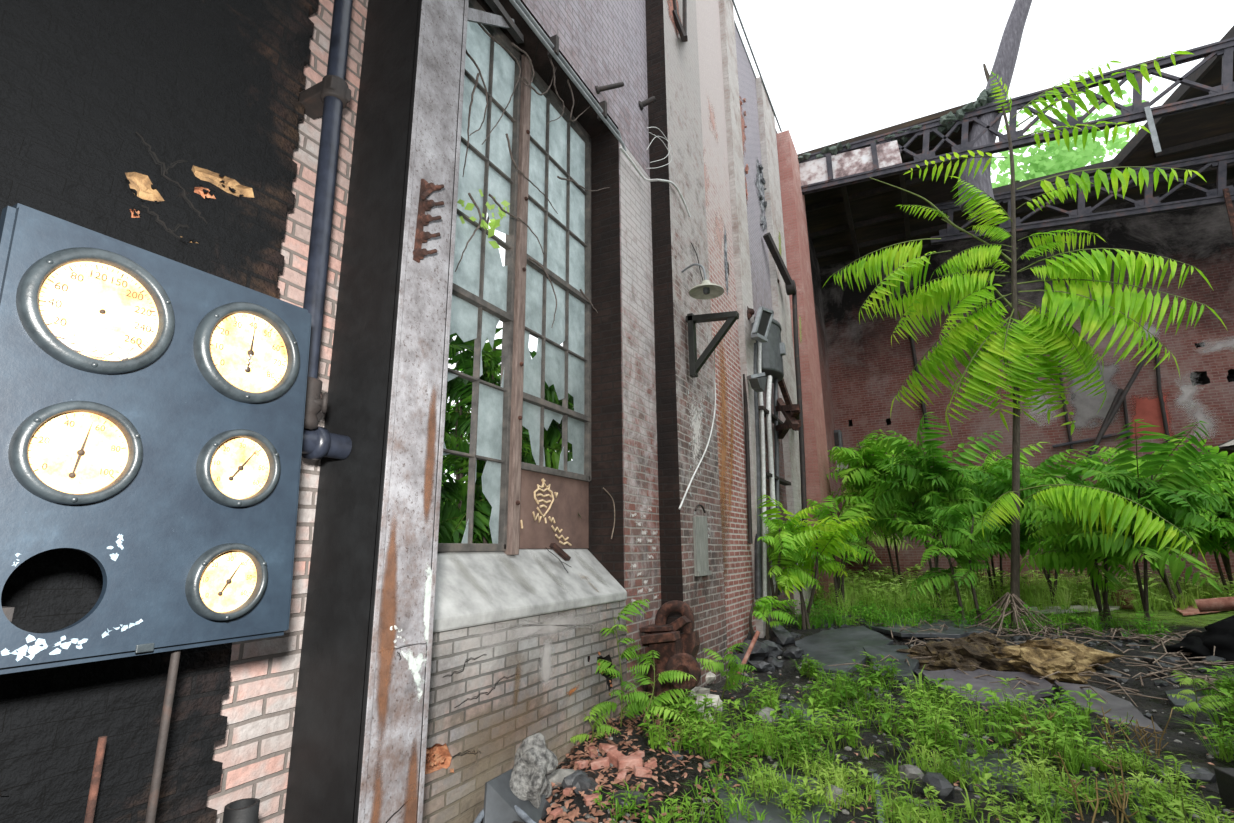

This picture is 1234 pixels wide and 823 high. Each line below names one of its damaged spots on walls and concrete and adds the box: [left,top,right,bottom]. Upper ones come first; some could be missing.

spalling [125,172,164,218]
spalling [192,165,254,200]
spalling [1190,371,1210,386]
peeling [1131,394,1173,437]
rust [424,395,436,518]
rust [378,527,397,727]
spalling [425,743,454,774]
rust [371,769,381,823]
rust [405,749,417,823]